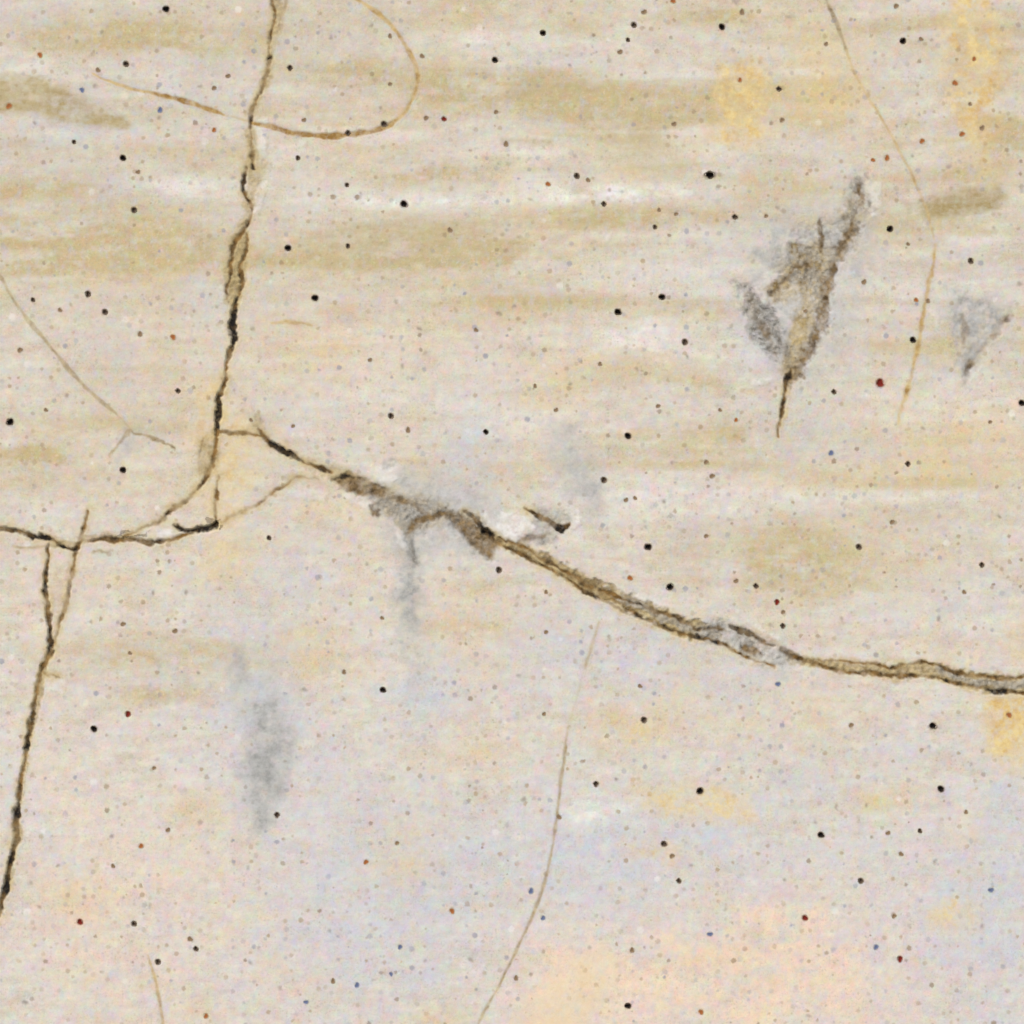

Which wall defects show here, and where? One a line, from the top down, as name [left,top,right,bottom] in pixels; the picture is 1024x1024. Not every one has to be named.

crack [823,0,938,427]
crack [0,0,422,936]
crack [476,534,1024,1024]